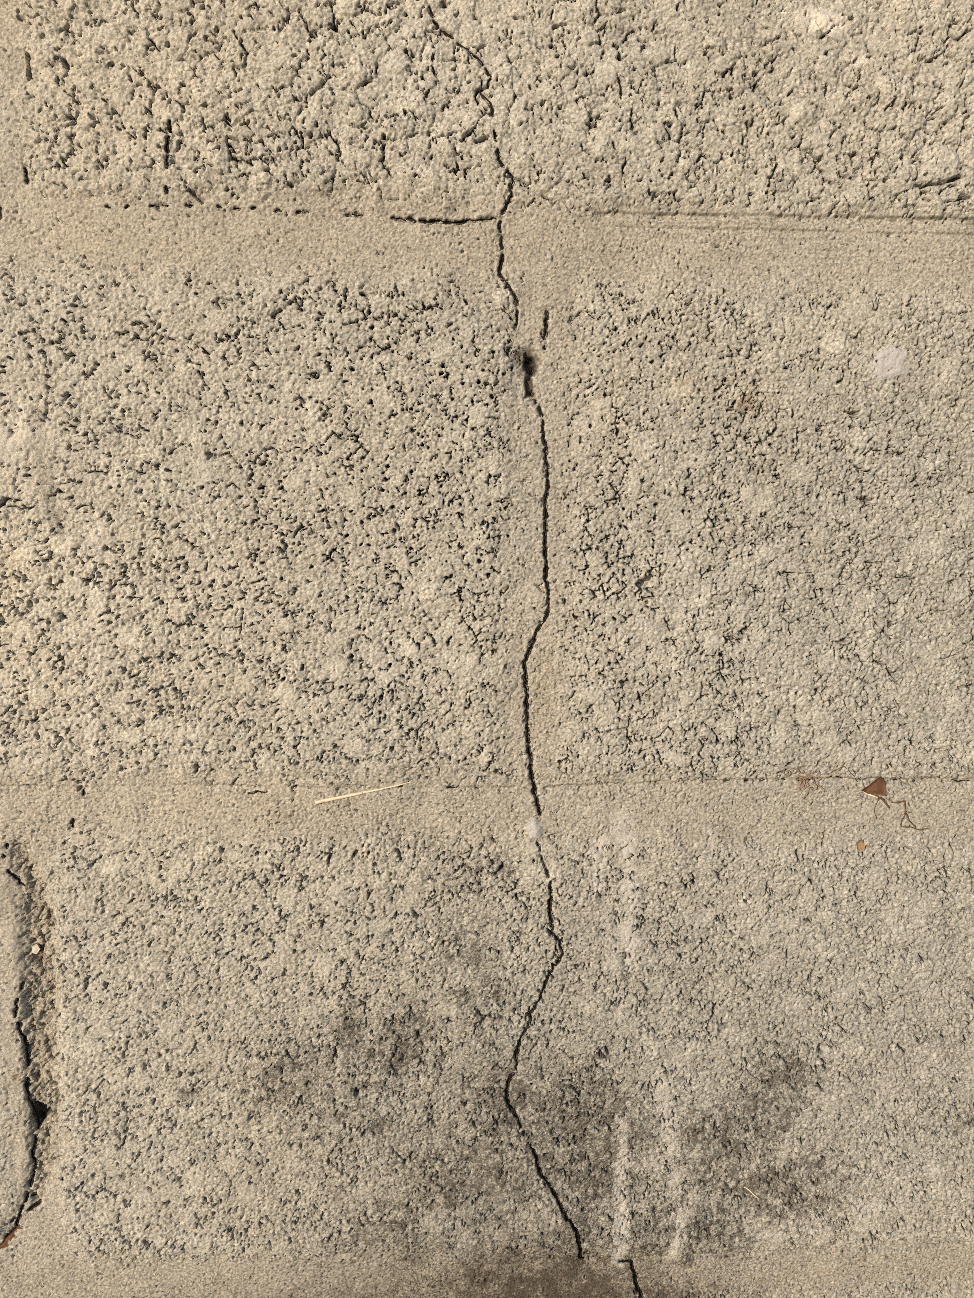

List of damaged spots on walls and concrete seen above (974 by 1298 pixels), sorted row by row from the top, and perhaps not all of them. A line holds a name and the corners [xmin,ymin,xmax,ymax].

crack [345,5,548,355]
crack [3,843,25,886]
crack [505,389,584,1259]
crack [1,981,64,1248]
crack [618,1260,643,1298]